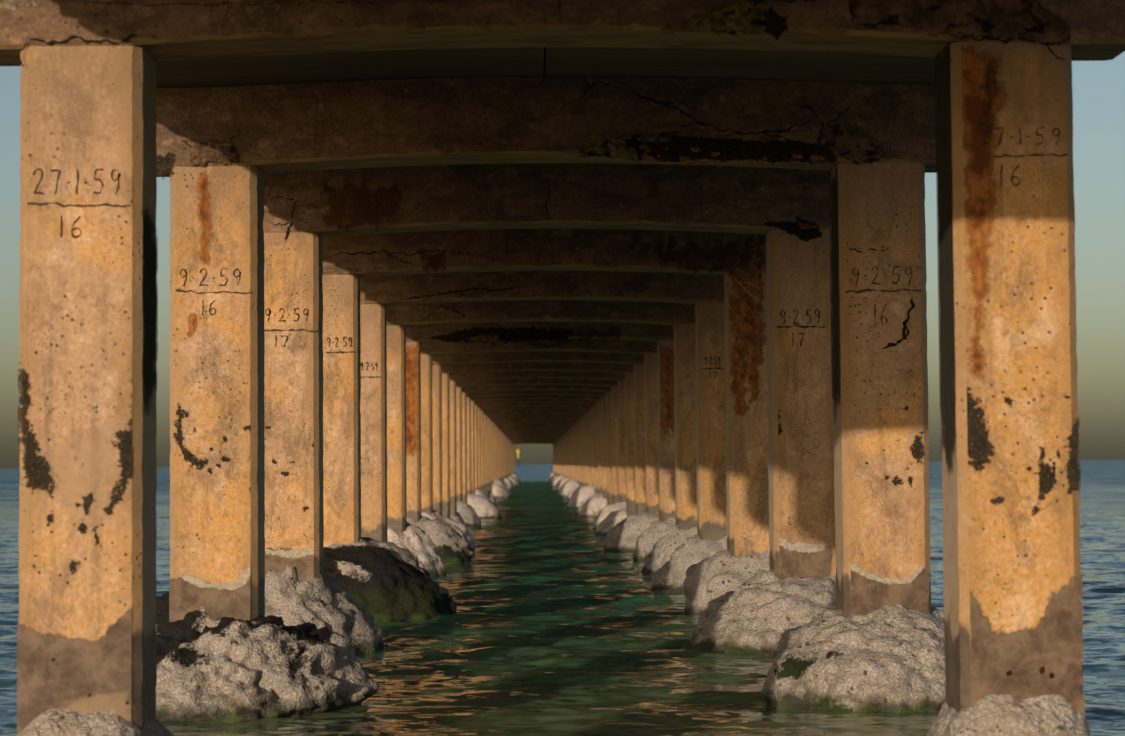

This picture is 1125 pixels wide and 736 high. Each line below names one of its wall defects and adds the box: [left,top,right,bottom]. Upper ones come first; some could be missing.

crack [17,34,142,68]
spalling [848,0,1070,45]
crack [579,78,851,150]
spalling [632,121,890,165]
rust [961,47,1006,378]
rust [728,271,766,416]
crack [882,292,915,349]
damp [18,363,55,498]
rust [659,346,675,434]
damp [967,387,998,473]
damp [17,608,132,734]
damp [970,574,1085,720]